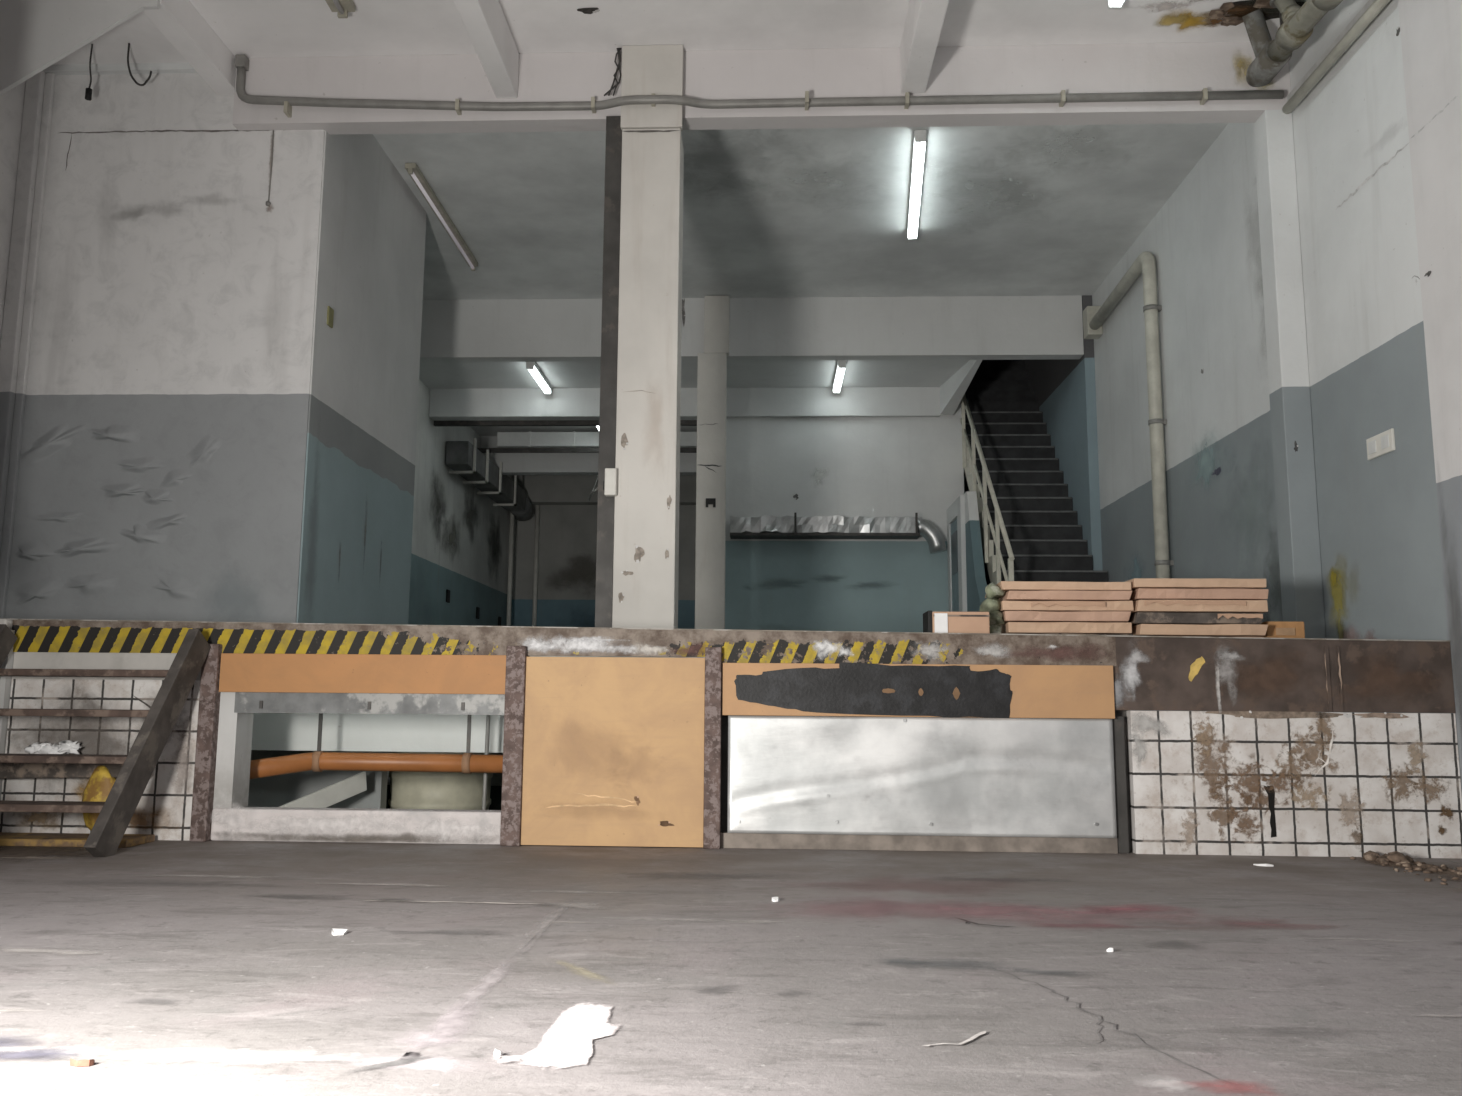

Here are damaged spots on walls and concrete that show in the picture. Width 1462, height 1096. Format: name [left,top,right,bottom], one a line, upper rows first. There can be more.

spalling [1151,0,1279,26]